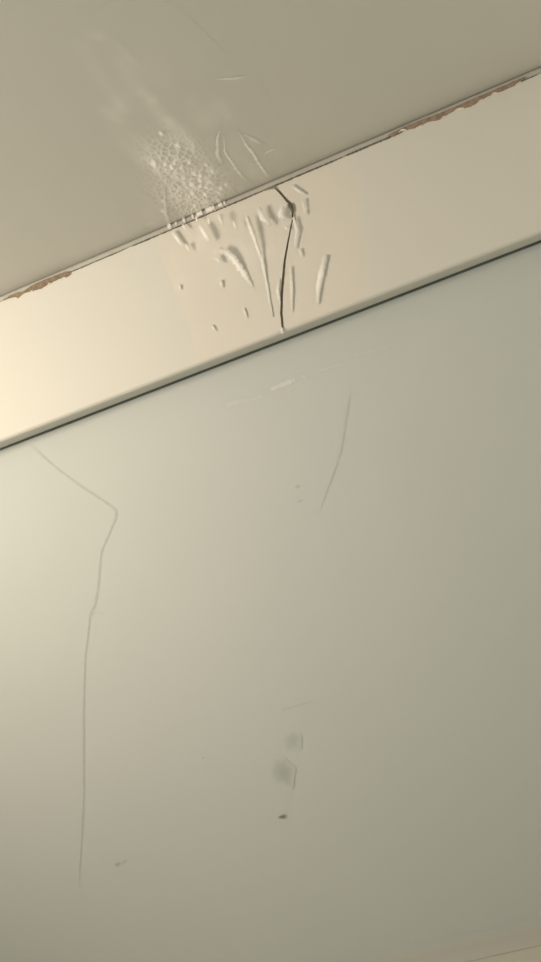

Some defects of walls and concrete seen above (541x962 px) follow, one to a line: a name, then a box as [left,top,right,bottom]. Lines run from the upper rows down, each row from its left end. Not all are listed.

peeling [389,77,525,136]
peeling [3,272,71,300]
crack [71,132,402,328]
crack [30,445,117,887]